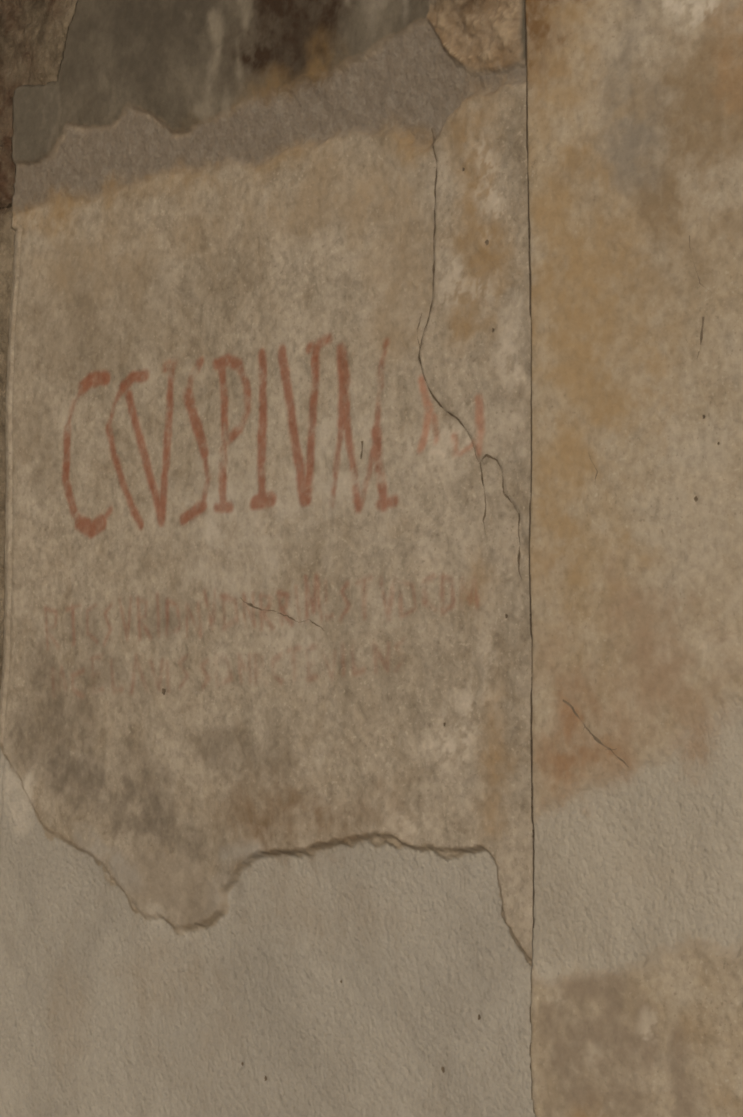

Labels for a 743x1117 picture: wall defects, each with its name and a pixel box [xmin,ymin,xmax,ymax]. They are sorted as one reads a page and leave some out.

crack [417,0,535,928]
crack [563,699,629,768]